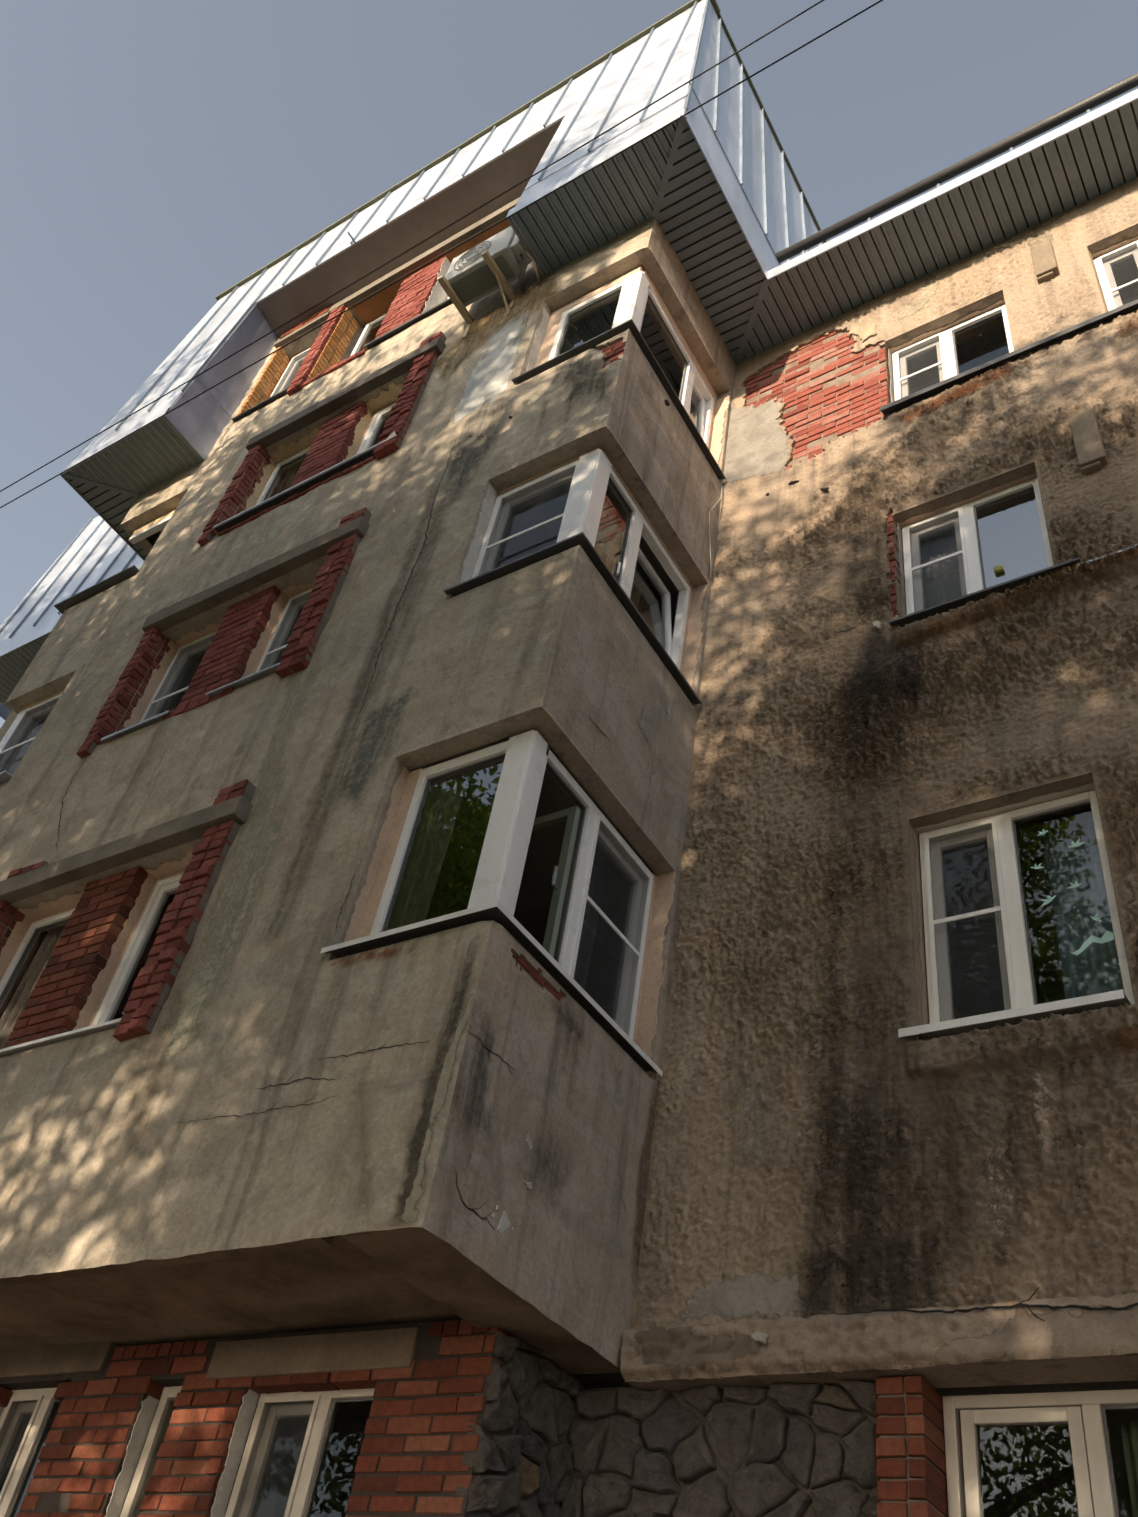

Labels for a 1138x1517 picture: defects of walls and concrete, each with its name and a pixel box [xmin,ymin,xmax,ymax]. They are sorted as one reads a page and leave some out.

leakage [553,360,608,398]
flaking render [744,318,891,470]
leakage [409,398,504,587]
crack [175,1041,428,1124]
crack [468,1031,515,1072]
crack [455,1170,493,1228]
leakage [808,1075,1018,1309]
crack [830,1287,1138,1321]